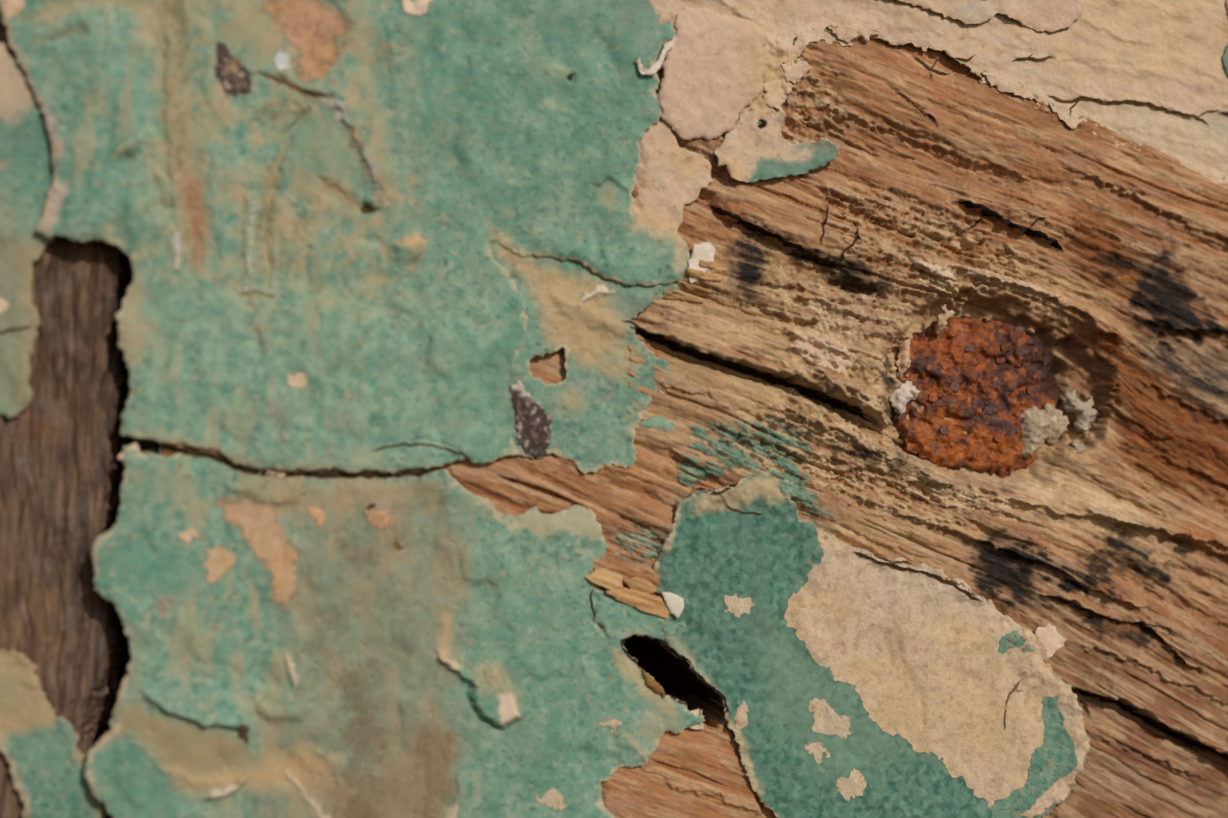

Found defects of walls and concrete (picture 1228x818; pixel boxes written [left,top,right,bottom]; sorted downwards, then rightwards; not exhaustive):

peeling [635,38,676,75]
peeling [763,58,812,110]
peeling [982,70,1087,129]
peeling [686,241,715,283]
crack [113,269,474,526]
crack [499,475,584,507]
peeling [662,592,684,618]
spalling [724,593,755,618]
crack [101,597,132,710]
peeling [784,521,1090,818]
peeling [0,649,106,818]
spalling [734,701,750,729]